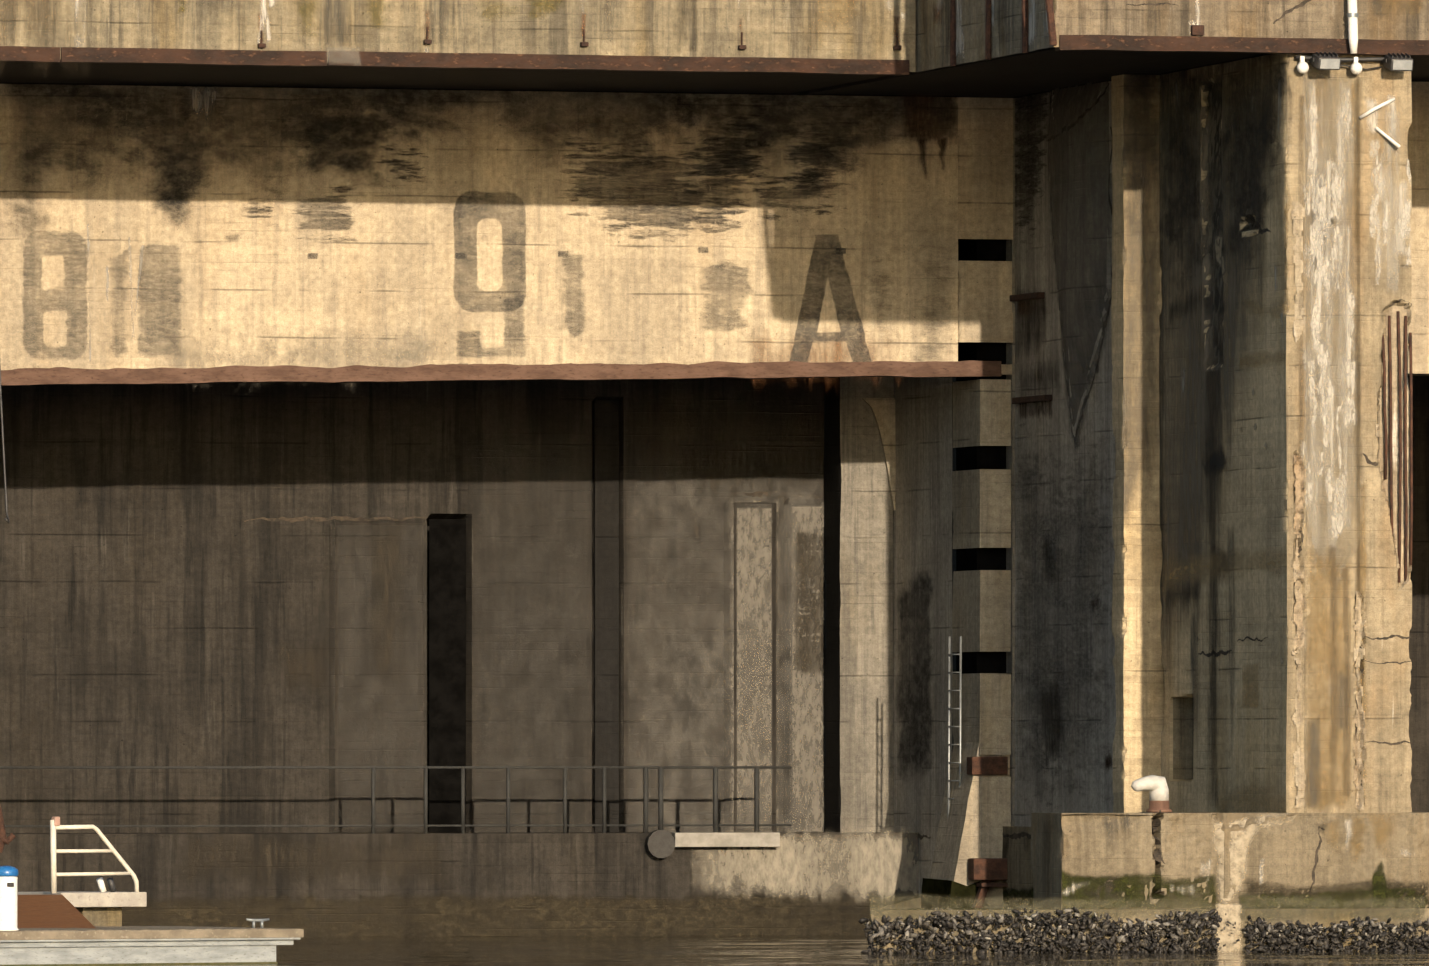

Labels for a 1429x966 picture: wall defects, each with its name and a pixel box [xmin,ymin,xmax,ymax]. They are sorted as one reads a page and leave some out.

water stain [1301,87,1411,537]
spalling [1376,306,1413,584]
spalling [1280,453,1307,808]
spalling [1353,591,1367,810]
crack [1152,810,1165,881]